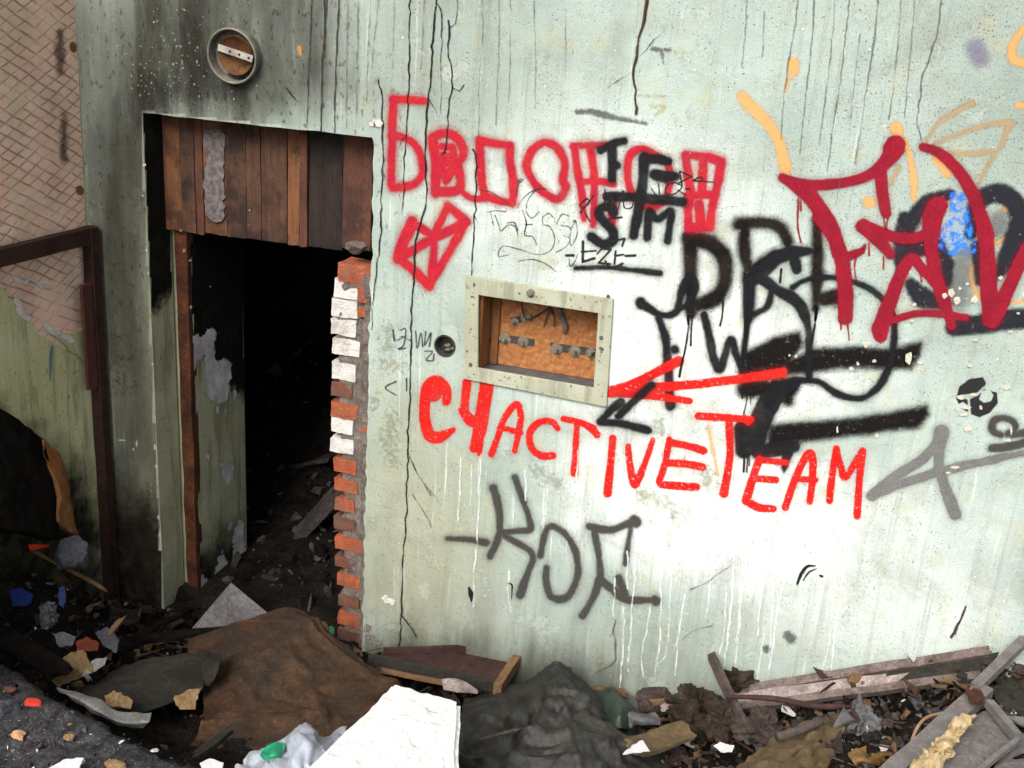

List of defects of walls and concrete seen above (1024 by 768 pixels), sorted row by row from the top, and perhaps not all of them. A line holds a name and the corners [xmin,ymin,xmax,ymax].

crack [614,0,657,115]
peeling [193,328,237,415]
flaking render [330,241,382,648]
crack [371,0,464,647]